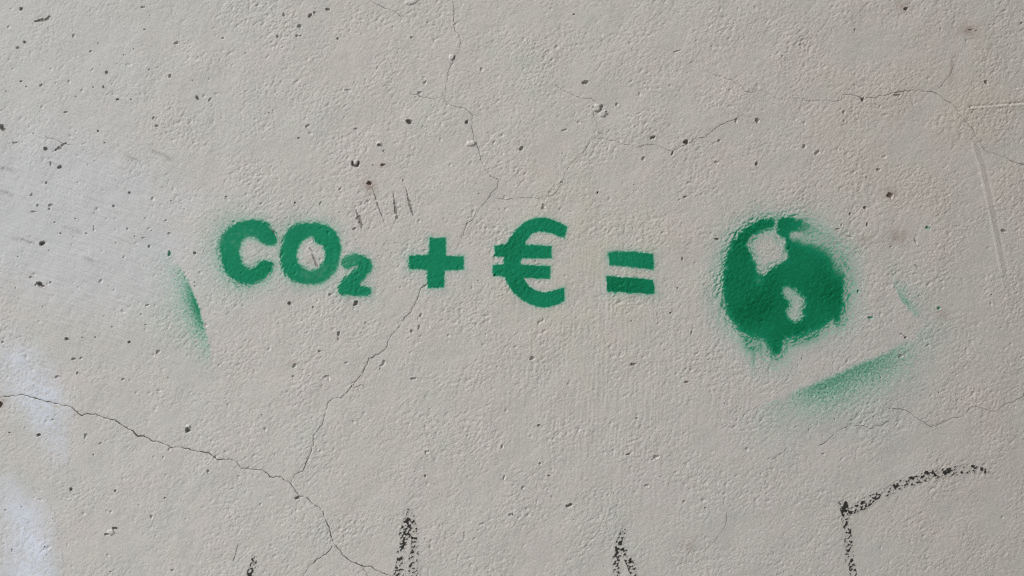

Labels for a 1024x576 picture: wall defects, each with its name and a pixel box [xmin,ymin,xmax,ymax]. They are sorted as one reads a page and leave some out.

crack [3,284,427,575]